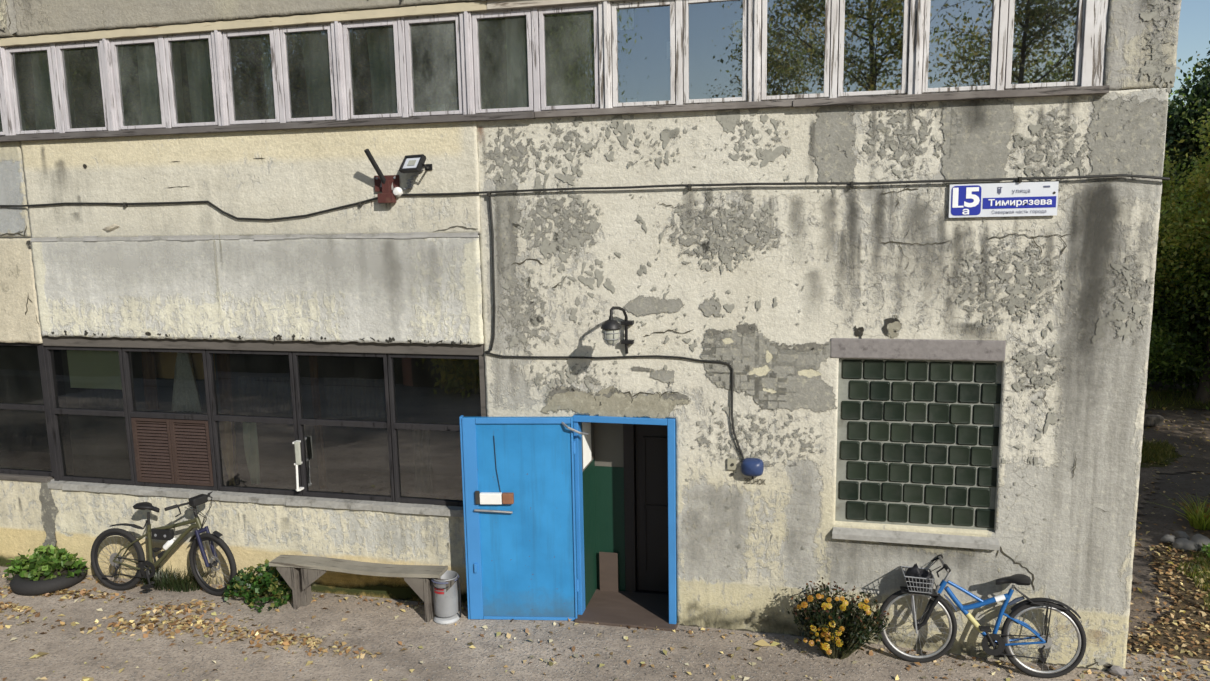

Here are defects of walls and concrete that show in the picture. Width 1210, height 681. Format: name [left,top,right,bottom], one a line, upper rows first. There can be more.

peeling [477,0,1181,499]
damp [841,202,858,261]
damp [876,195,894,239]
damp [940,217,962,256]
damp [1081,187,1116,307]
crack [996,546,1035,591]